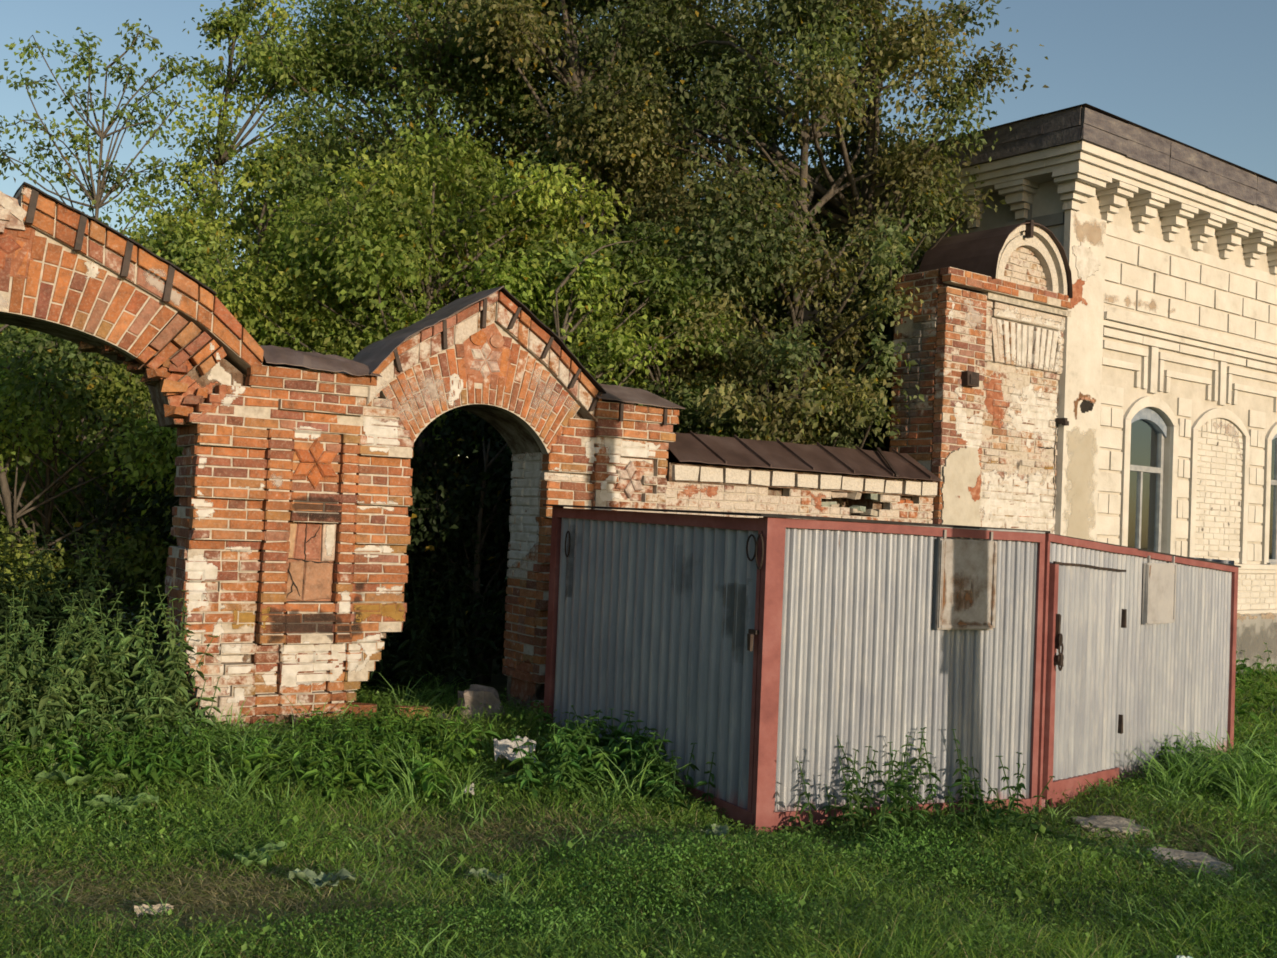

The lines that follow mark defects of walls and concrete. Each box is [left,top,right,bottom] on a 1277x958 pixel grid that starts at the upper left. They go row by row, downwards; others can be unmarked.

flaking render [1106,297,1156,309]
peeling [948,242,1101,451]
flaking render [684,484,719,508]
flaking render [803,490,878,516]
peeling [958,470,1056,534]
peeling [225,546,252,554]
peeling [185,554,390,703]
peeling [375,586,403,595]
damp [723,585,746,650]
rust [941,552,992,628]